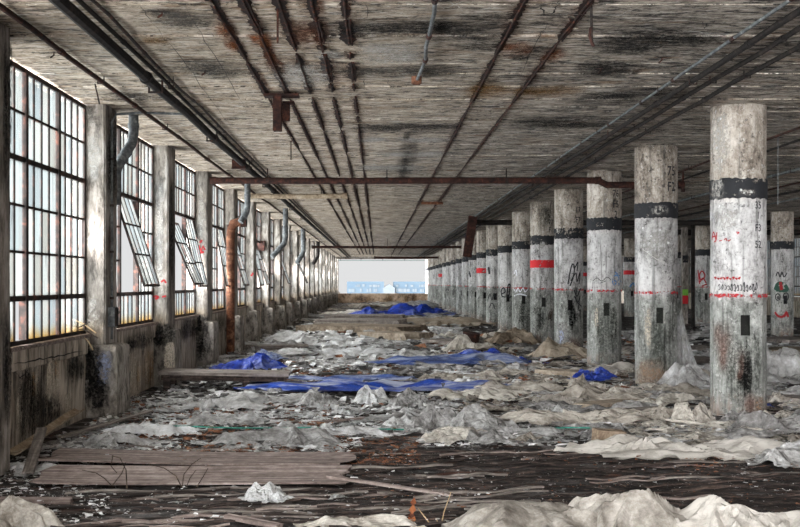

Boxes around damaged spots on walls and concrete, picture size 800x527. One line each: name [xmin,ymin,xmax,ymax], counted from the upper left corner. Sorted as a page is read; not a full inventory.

water stain [578,27,715,77]
water stain [183,318,210,361]
water stain [645,310,671,360]
water stain [3,321,111,436]
water stain [730,342,759,401]